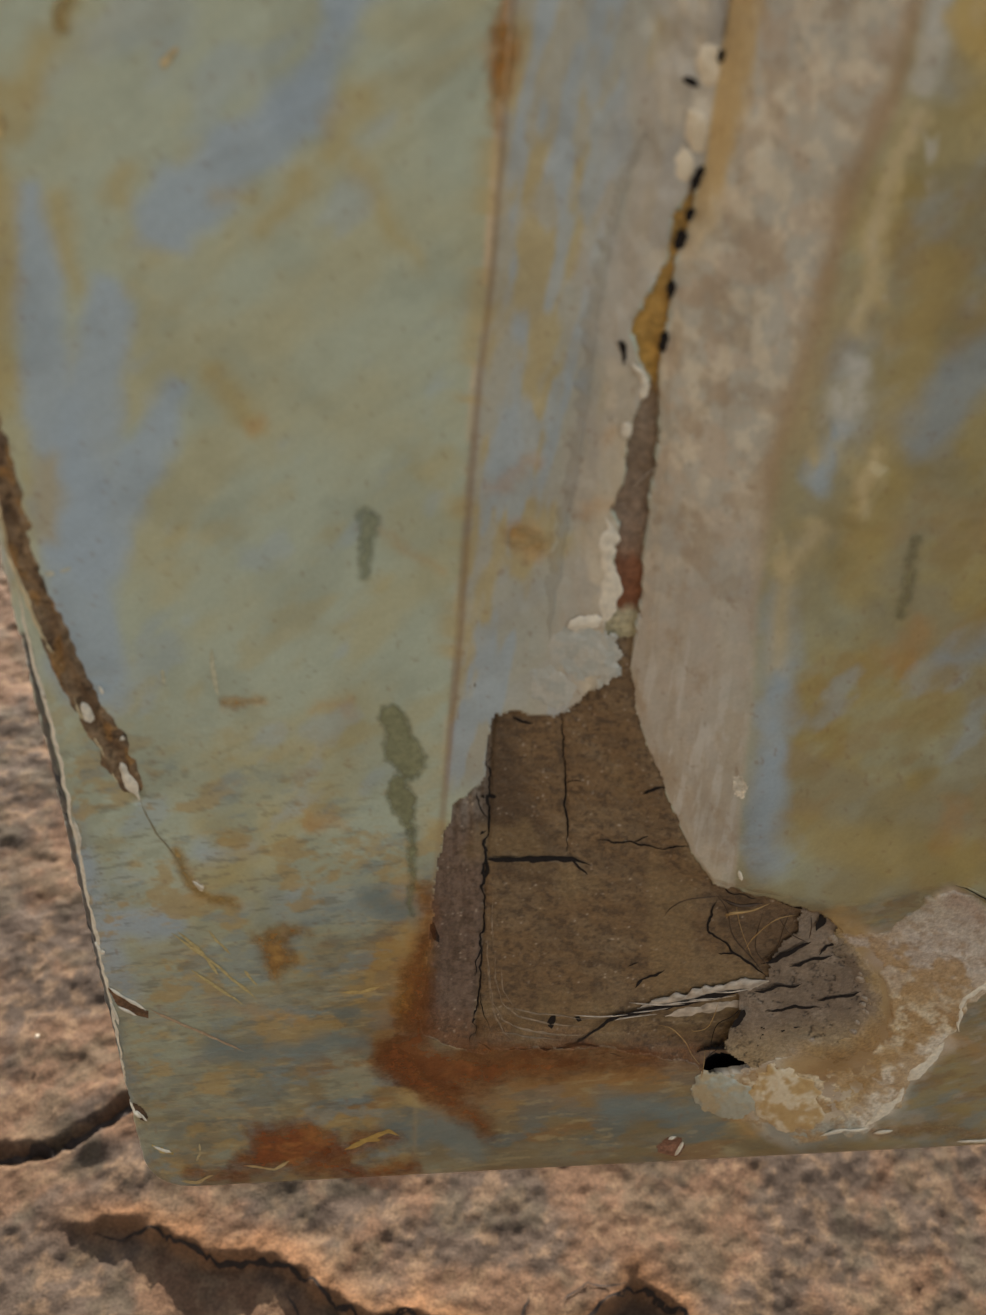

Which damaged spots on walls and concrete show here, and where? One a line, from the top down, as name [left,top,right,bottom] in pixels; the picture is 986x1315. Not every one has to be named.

crack [567,2,729,638]
leakage [359,509,379,579]
rust [0,418,233,905]
leakage [379,704,425,909]
spalling [420,636,986,1146]
crack [955,885,986,902]
rust [189,1123,419,1181]